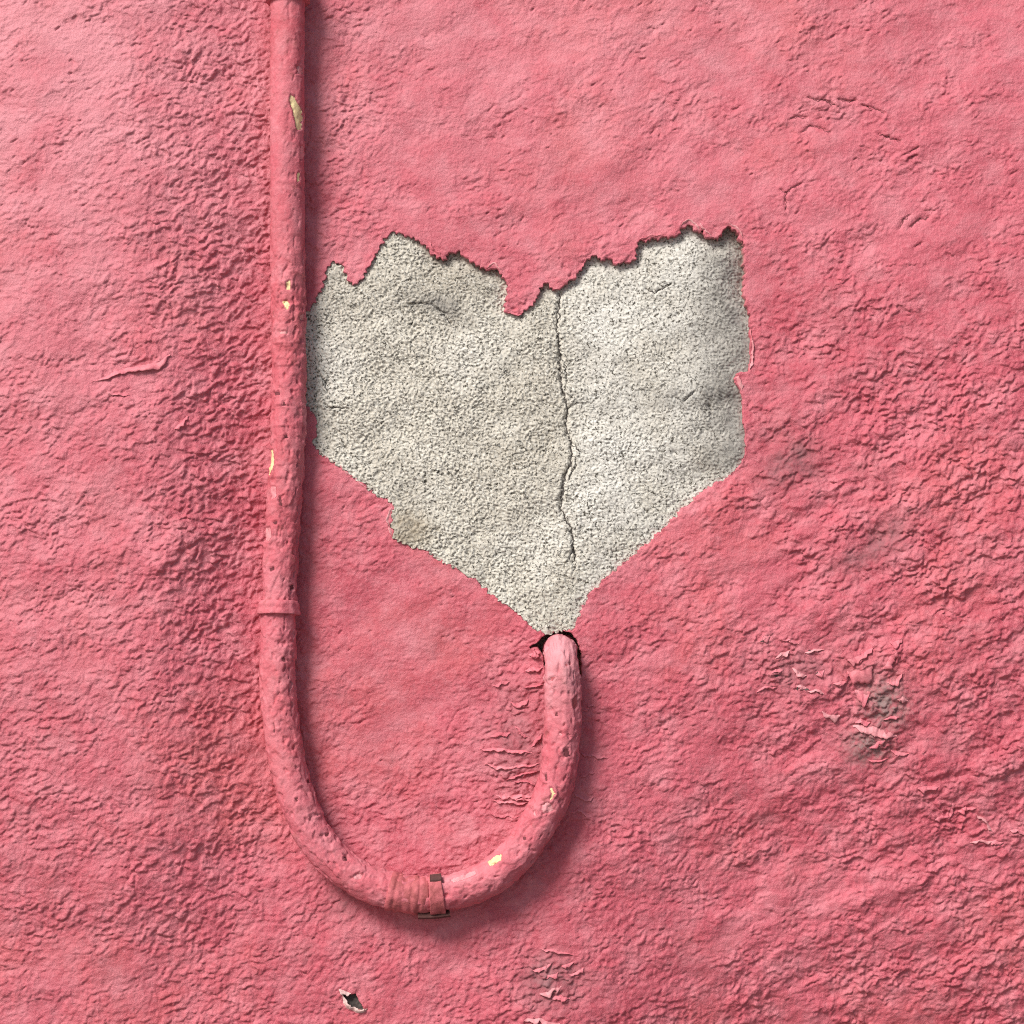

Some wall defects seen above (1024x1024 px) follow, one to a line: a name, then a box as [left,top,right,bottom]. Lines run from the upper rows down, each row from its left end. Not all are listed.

spalling [300,219,754,635]
crack [555,294,582,570]
peeling [511,649,555,708]
spalling [756,638,909,763]
peeling [480,726,555,819]
peeling [339,989,368,1013]